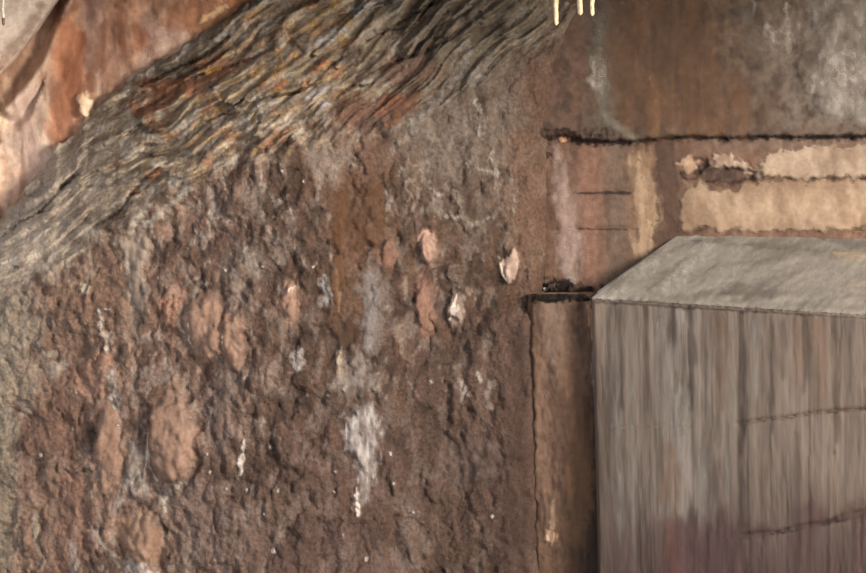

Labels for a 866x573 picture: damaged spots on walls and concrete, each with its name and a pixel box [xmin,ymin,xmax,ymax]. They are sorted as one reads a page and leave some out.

leakage [141,21,245,62]
efflorescence [199,0,229,24]
efflorescence [590,12,633,138]
efflorescence [764,2,800,50]
efflorescence [809,0,866,122]
crack [540,127,866,158]
peeling [675,142,866,233]
crack [738,408,866,424]
crack [741,504,866,573]